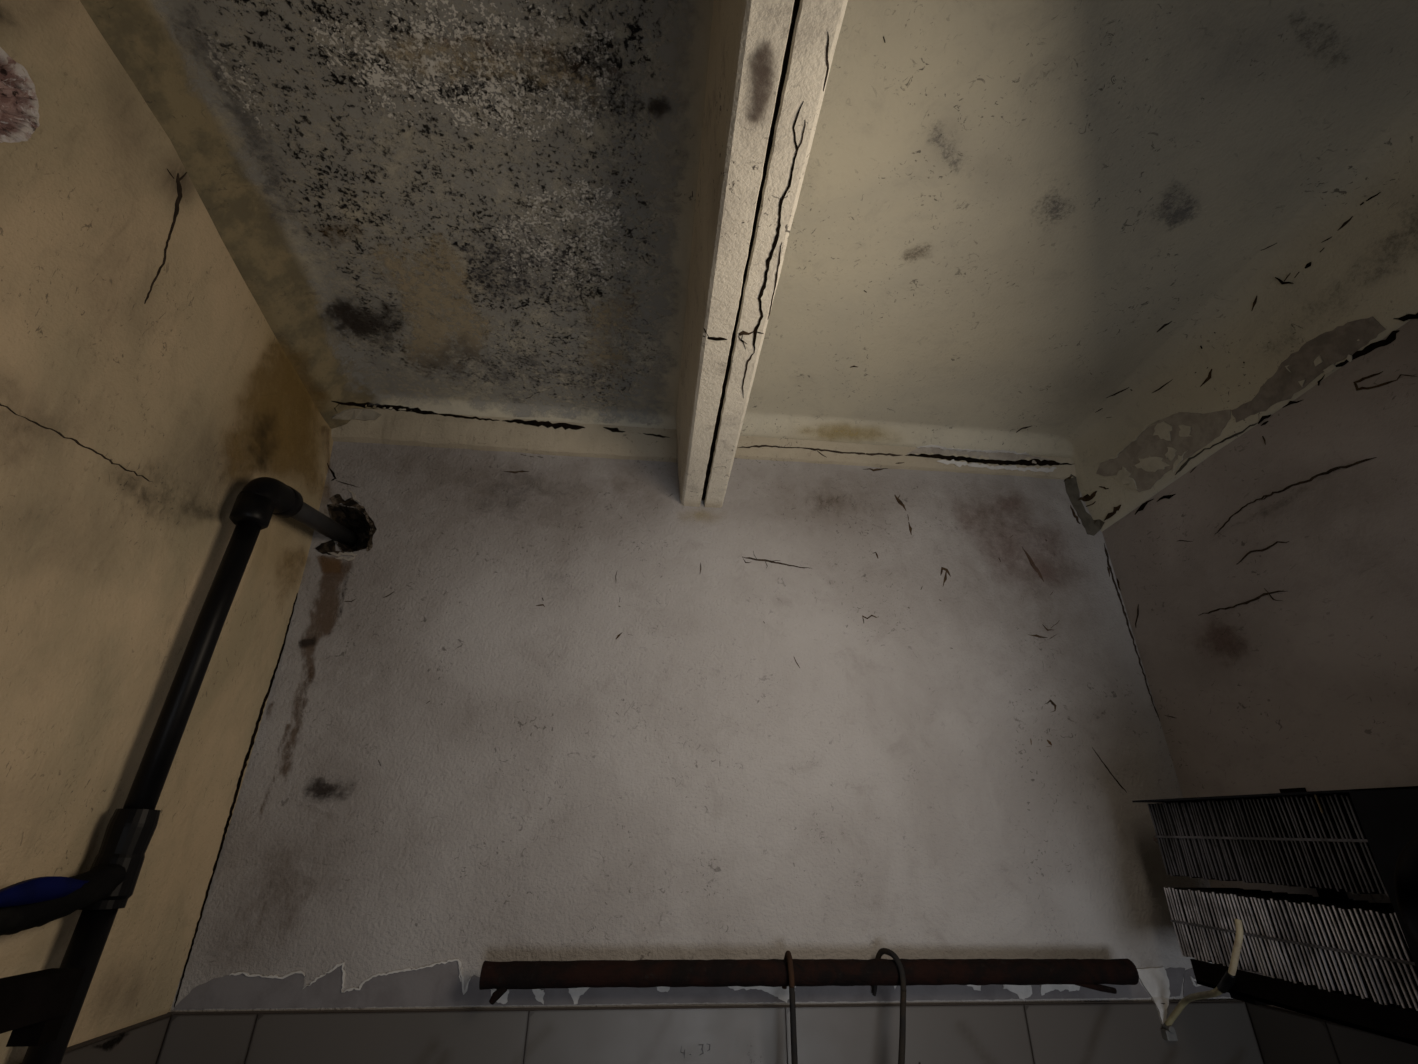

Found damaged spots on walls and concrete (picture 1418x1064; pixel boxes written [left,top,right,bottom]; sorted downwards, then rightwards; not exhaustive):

spalling [0,47,40,143]
crack [144,169,187,304]
water stain [162,0,693,421]
crack [701,0,1072,500]
crack [1252,192,1381,310]
crack [332,395,670,438]
crack [1135,313,1418,515]
peeling [1231,316,1386,422]
peeling [907,445,1121,536]
crack [1178,457,1377,542]
peeling [173,959,1151,1010]
peeling [1165,967,1231,997]